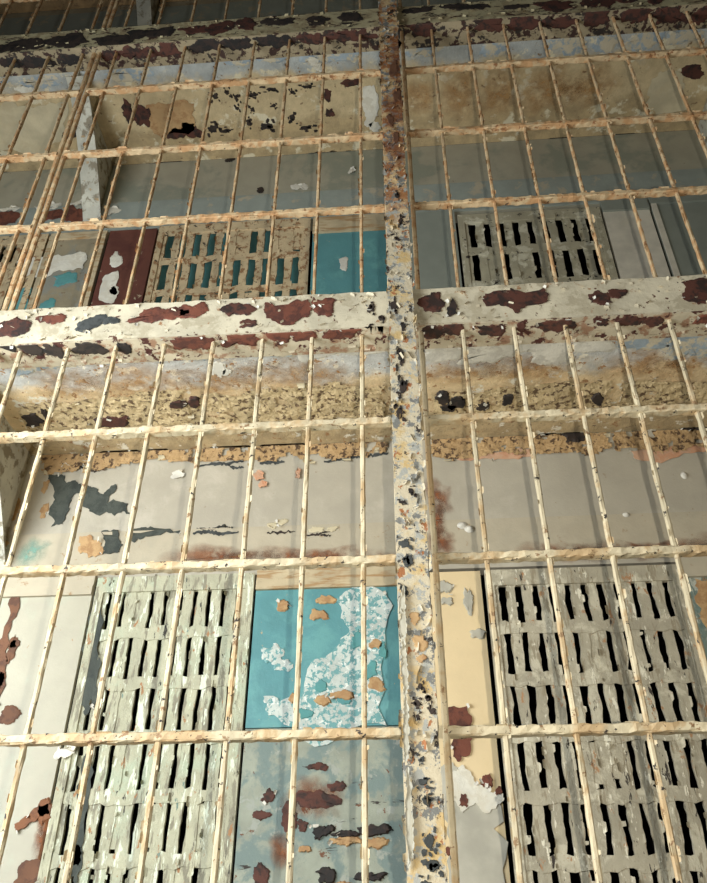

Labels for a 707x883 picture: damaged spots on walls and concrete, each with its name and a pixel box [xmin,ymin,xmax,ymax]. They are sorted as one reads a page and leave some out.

peeling [389,0,707,77]
peeling [0,101,76,154]
peeling [121,98,233,140]
spalling [208,83,335,133]
peeling [98,251,123,304]
peeling [0,287,408,378]
spalling [18,348,408,431]
peeling [39,441,389,527]
peeling [81,596,104,715]
peeling [252,580,508,883]
corrosion [14,797,52,852]
peeling [53,745,94,883]